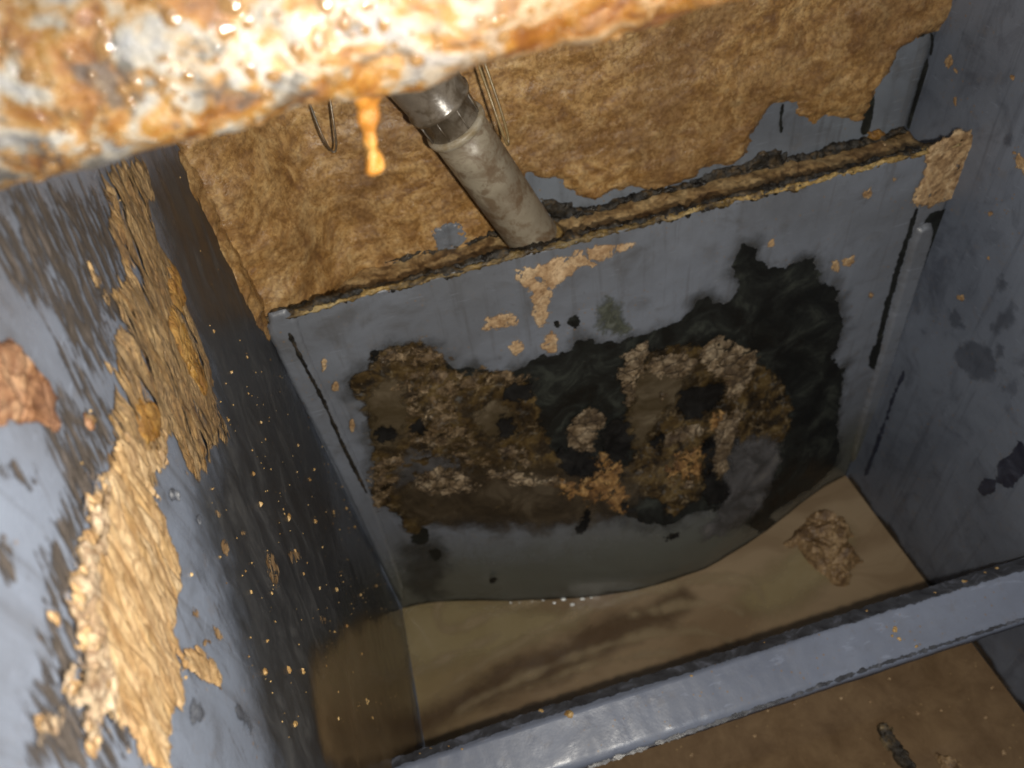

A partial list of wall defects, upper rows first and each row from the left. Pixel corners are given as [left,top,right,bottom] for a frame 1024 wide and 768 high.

rust [0,0,743,485]
peeling [371,336,453,373]
peeling [0,168,222,768]
spalling [373,418,428,443]
peeling [366,448,491,508]
spalling [458,365,534,439]
leakage [151,158,945,768]
rust [557,452,631,513]
spalling [554,340,780,540]
leakage [978,441,1024,496]
leakage [972,641,1024,712]
peeling [235,704,253,731]